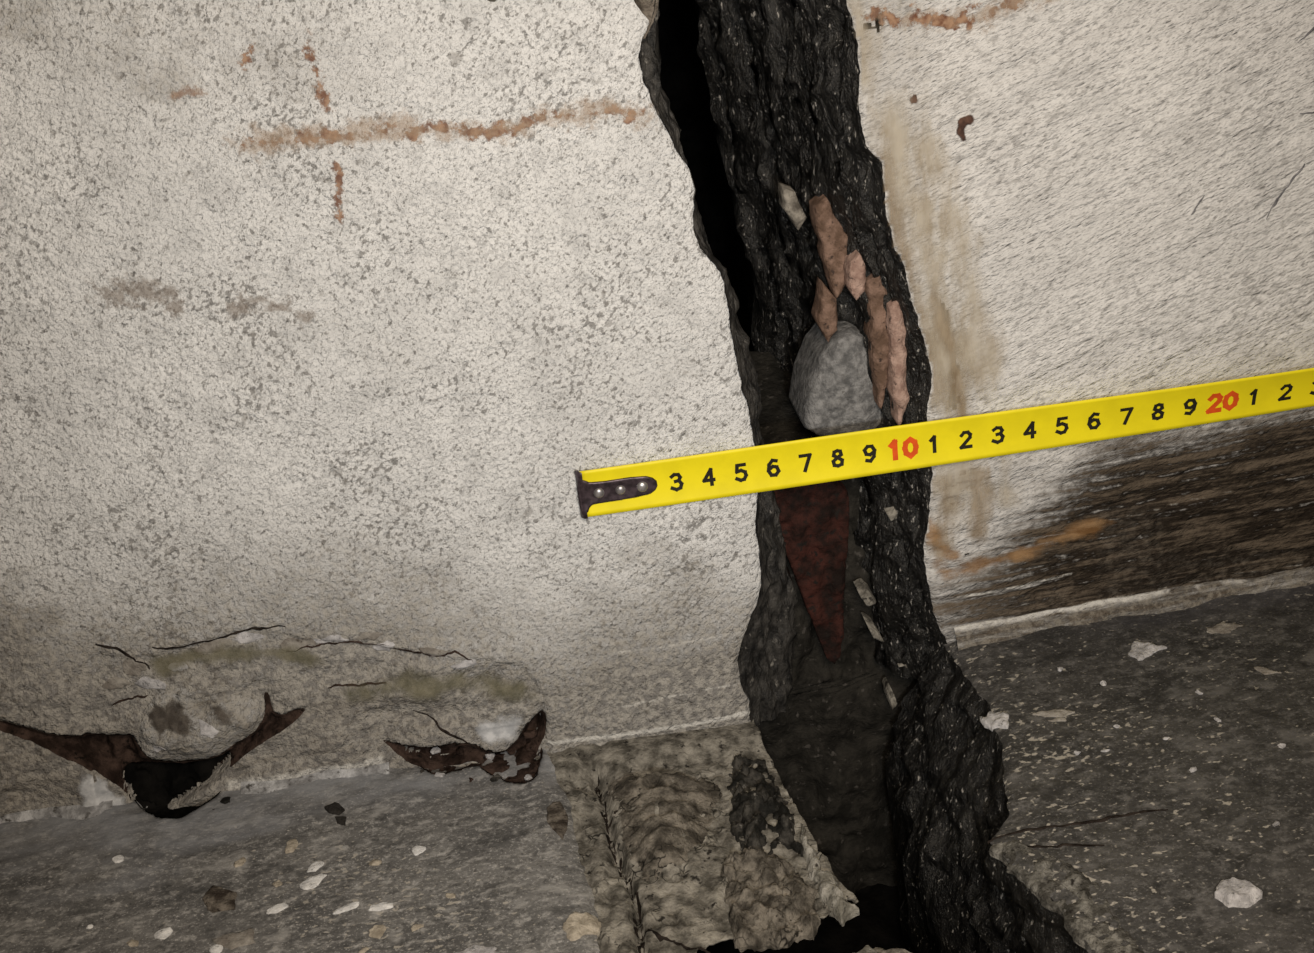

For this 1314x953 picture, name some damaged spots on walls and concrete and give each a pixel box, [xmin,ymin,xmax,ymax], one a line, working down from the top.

corrosion [861,0,1022,30]
corrosion [302,47,331,112]
corrosion [241,110,574,147]
corrosion [590,104,645,124]
corrosion [331,161,344,223]
crack [639,0,932,446]
leakage [918,290,997,417]
leakage [933,461,989,557]
spalling [0,692,305,819]
crack [595,467,1168,953]
spalling [383,710,859,953]